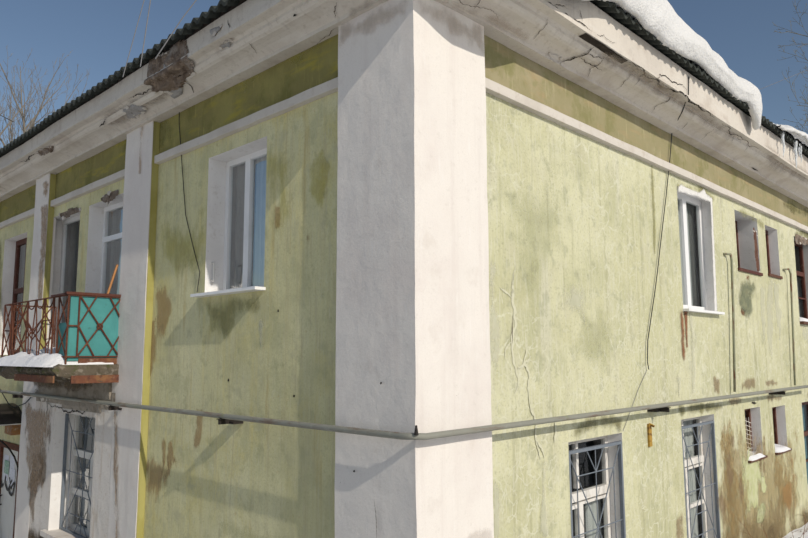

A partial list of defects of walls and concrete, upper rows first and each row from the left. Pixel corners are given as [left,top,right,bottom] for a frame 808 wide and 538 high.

spalling [143,40,196,99]
crack [538,2,755,147]
spalling [36,146,54,156]
damp [740,276,755,315]
peeling [25,389,115,493]
damp [726,461,784,538]